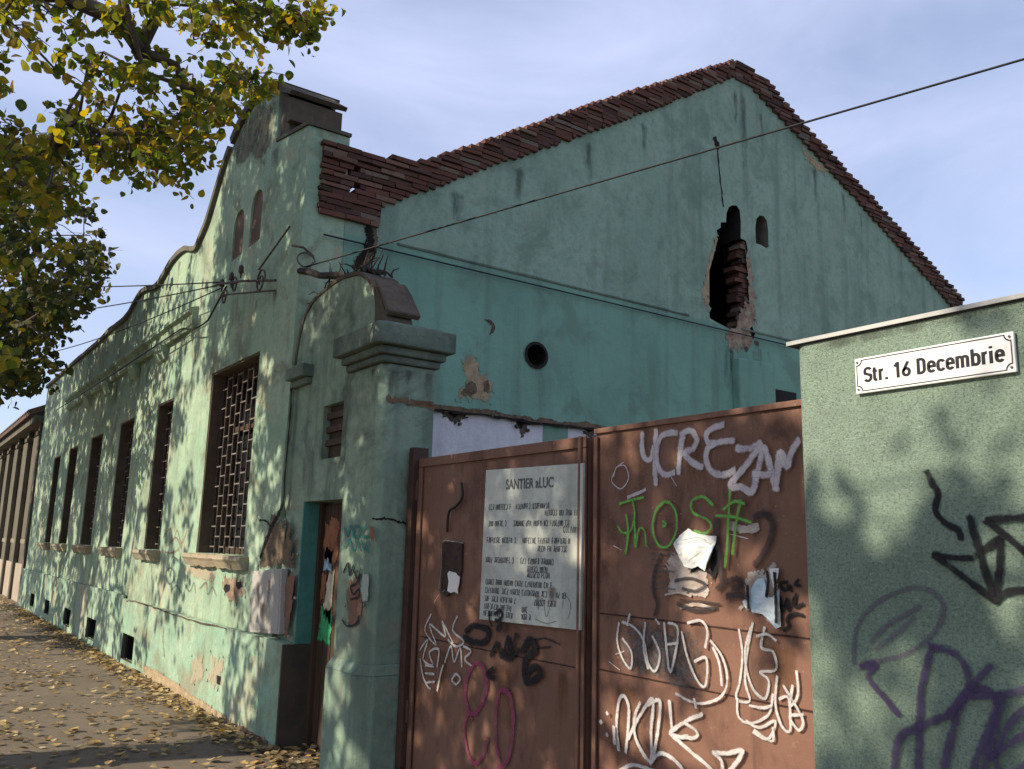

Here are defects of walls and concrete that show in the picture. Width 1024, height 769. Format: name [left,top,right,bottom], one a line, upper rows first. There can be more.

crack [353,207,379,269]
flaking render [702,235,719,319]
flaking render [725,250,759,353]
flaking render [386,354,606,438]
crack [372,516,406,525]